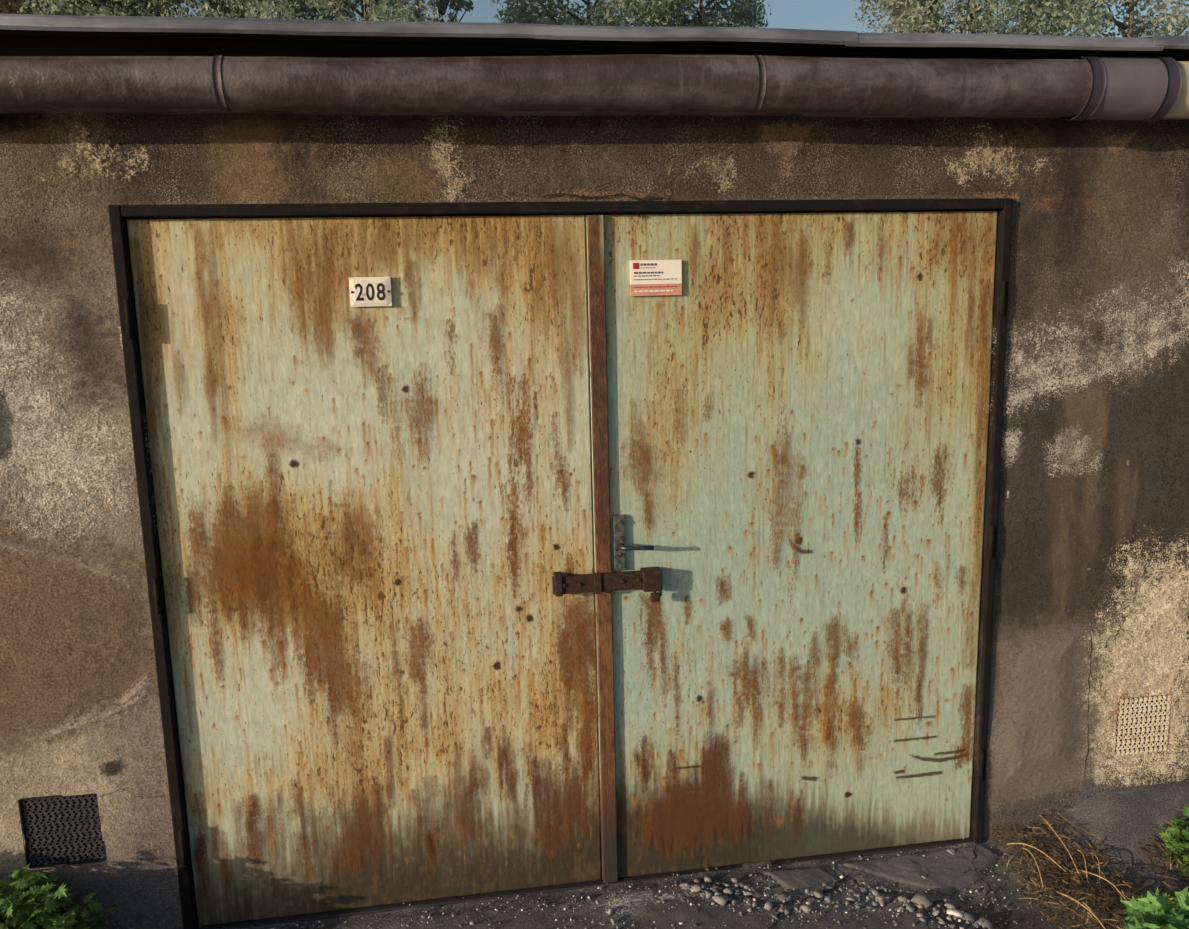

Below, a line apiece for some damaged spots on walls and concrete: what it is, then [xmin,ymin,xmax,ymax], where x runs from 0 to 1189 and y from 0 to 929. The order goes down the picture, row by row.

damp [942,120,1089,253]
damp [0,272,161,755]
rust [171,444,382,765]
rust [195,740,391,898]
rust [389,620,433,747]
rust [413,593,601,866]
rust [483,305,538,622]
rust [640,592,679,731]
rust [632,616,870,857]
rust [853,439,862,541]
rust [889,562,940,721]
damp [981,240,1189,635]